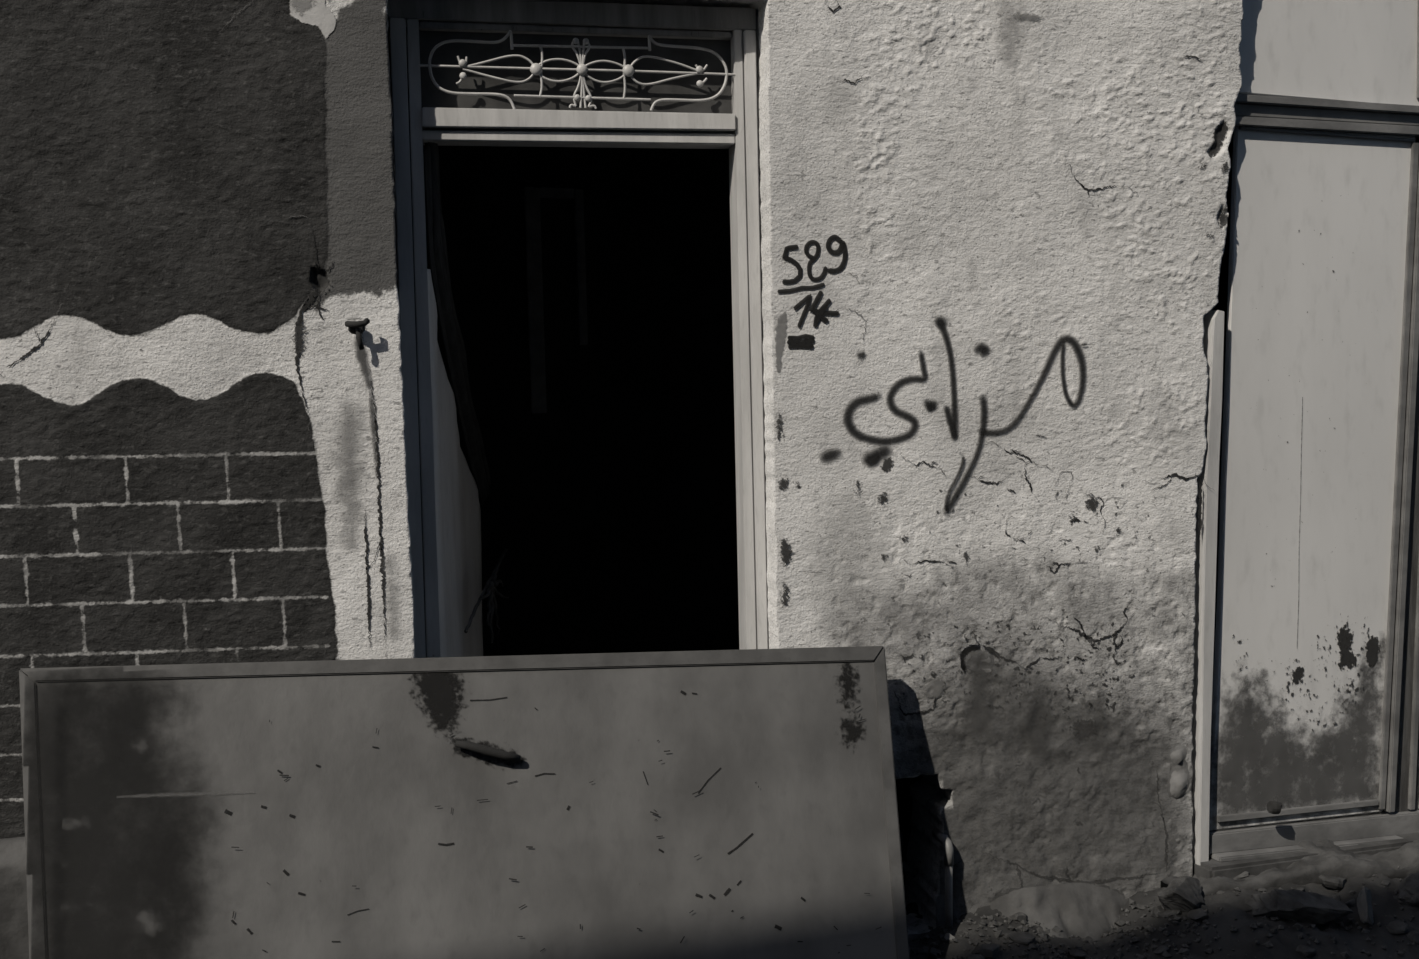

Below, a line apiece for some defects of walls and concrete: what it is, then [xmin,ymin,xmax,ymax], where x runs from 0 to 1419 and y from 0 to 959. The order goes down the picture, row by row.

peeling [290,0,336,38]
crack [1070,165,1137,195]
crack [0,302,65,376]
crack [1146,473,1212,543]
crack [973,605,1134,673]